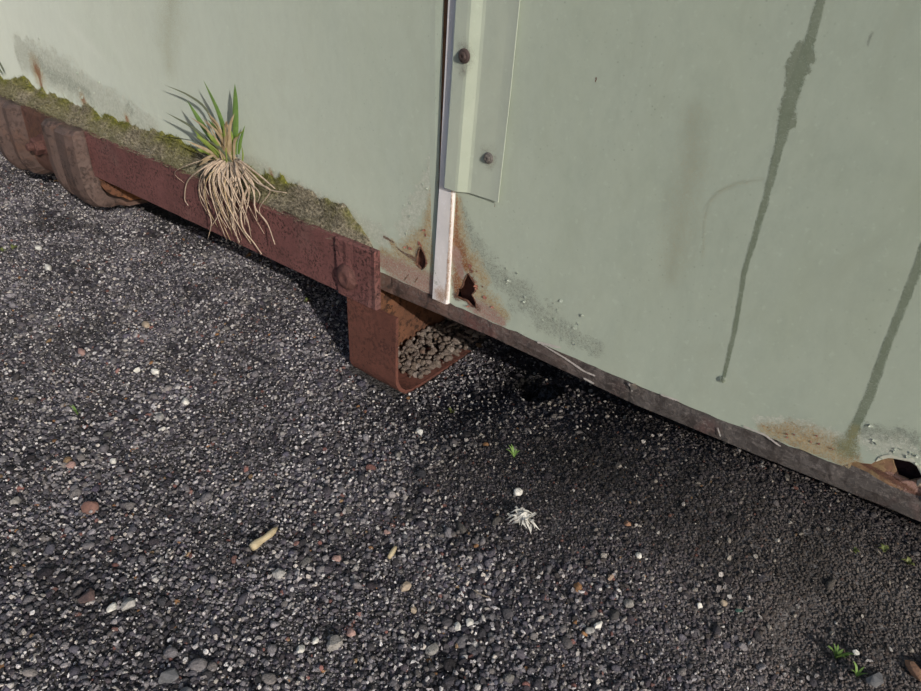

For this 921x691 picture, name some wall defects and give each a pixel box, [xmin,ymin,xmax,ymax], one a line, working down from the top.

corrosion [27,49,47,91]
corrosion [379,180,511,327]
peeling [459,200,605,359]
damp [702,0,825,383]
damp [830,244,921,461]
peeling [751,414,921,465]
corrosion [756,418,921,496]